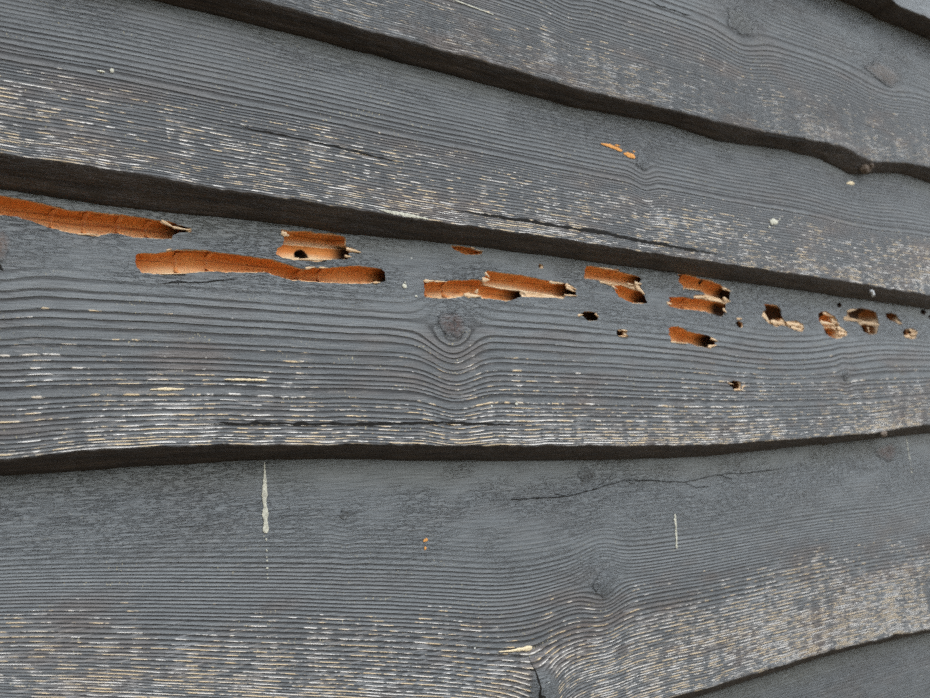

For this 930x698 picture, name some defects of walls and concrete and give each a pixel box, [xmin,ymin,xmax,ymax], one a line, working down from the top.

crack [528,655,546,698]